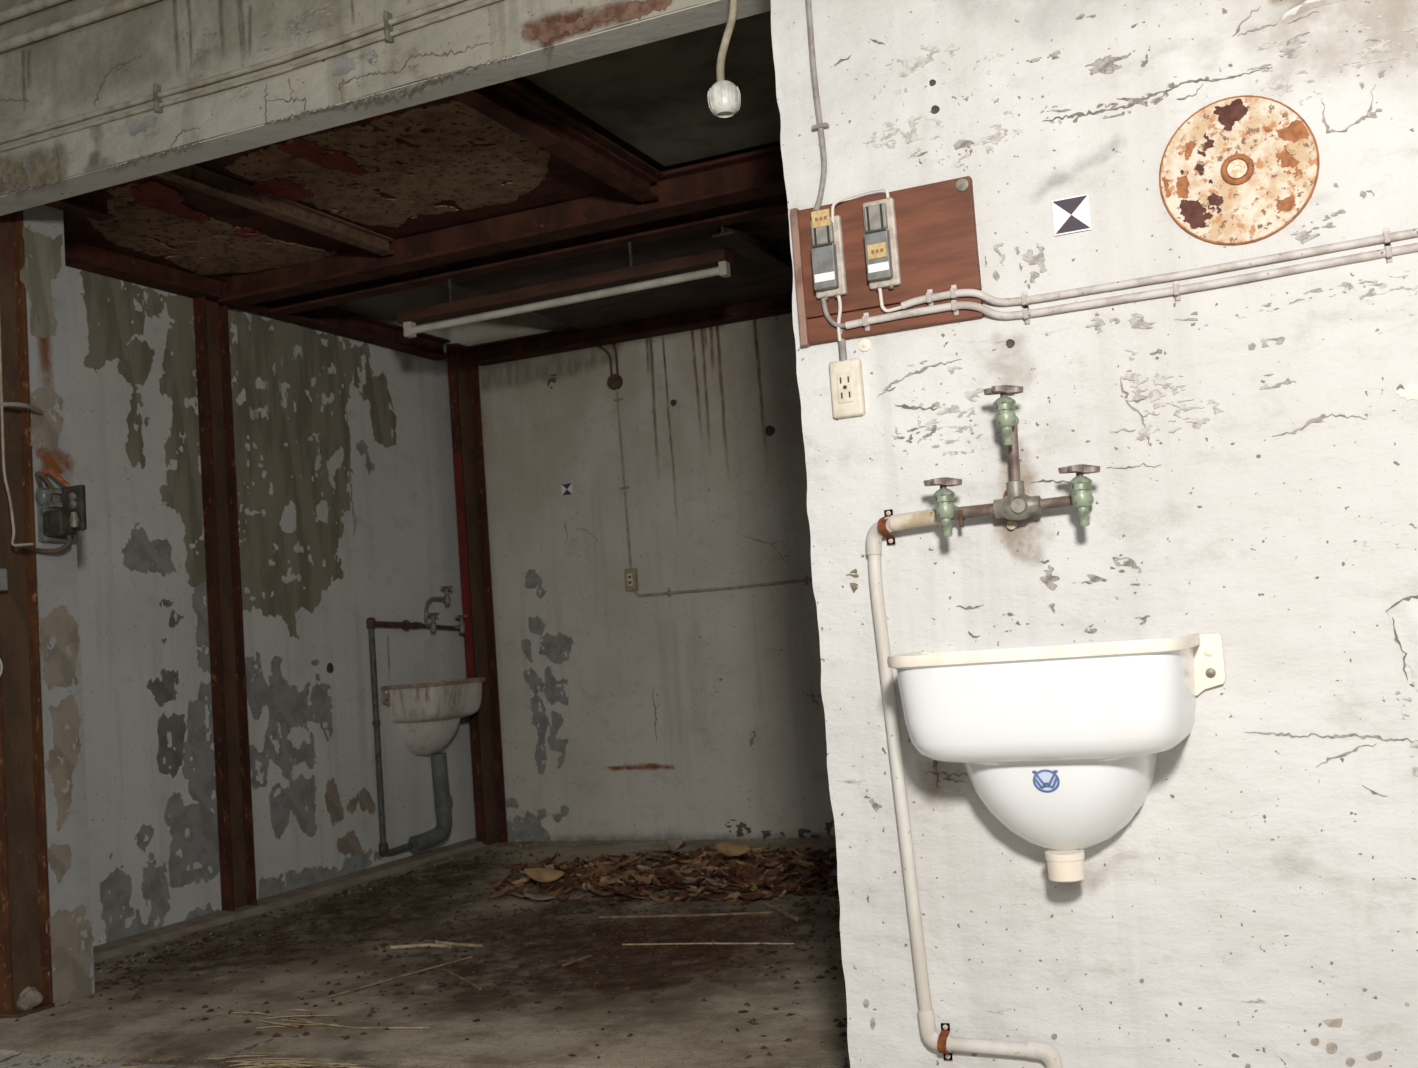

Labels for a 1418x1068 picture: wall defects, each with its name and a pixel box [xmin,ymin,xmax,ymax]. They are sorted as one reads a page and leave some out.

rust [525,3,627,46]
crack [1043,7,1318,122]
peeling [87,180,338,275]
peeling [225,99,551,228]
peeling [228,308,397,640]
peeling [46,270,220,1005]
peeling [521,569,574,775]
crack [1385,595,1418,680]
peeling [39,605,81,883]
peeling [245,651,383,900]
crack [1246,732,1418,797]
crack [734,1051,849,1068]